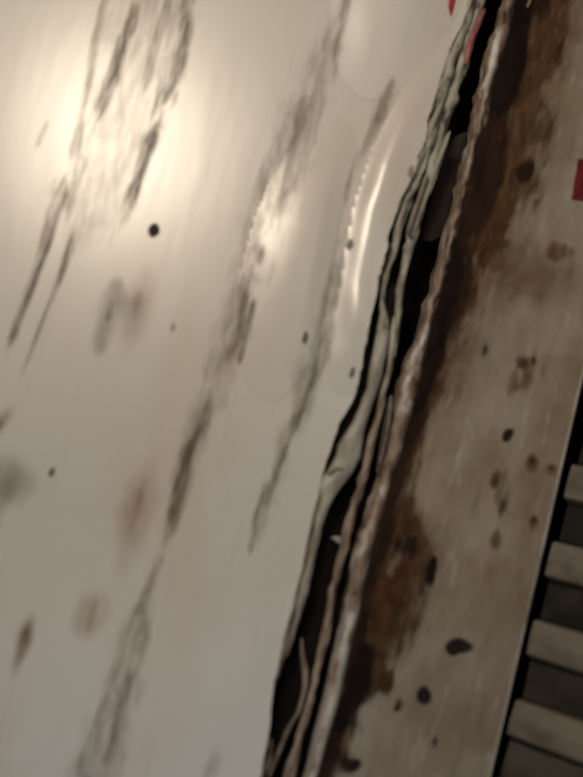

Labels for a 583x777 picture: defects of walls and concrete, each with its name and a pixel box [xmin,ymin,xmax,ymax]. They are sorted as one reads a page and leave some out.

leakage [149,224,159,237]
peeling [261,0,486,777]
corrosion [317,0,569,777]